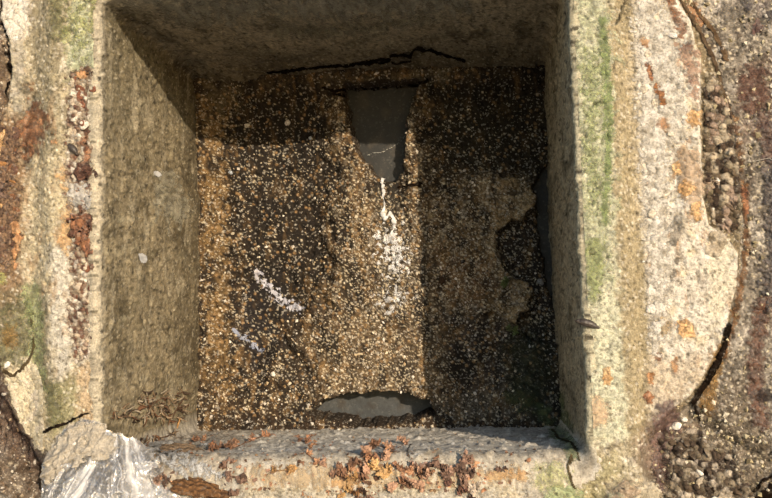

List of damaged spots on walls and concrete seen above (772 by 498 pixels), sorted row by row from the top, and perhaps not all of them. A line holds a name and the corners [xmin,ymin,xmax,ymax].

crack [267,46,466,98]
corrosion [645,62,667,105]
corrosion [663,0,703,127]
crack [680,0,734,130]
corrosion [0,17,57,275]
corrosion [670,145,706,224]
peeling [193,65,561,431]
leakage [737,63,772,433]
crack [691,323,732,421]
corrosion [0,403,53,498]
crack [42,411,92,434]